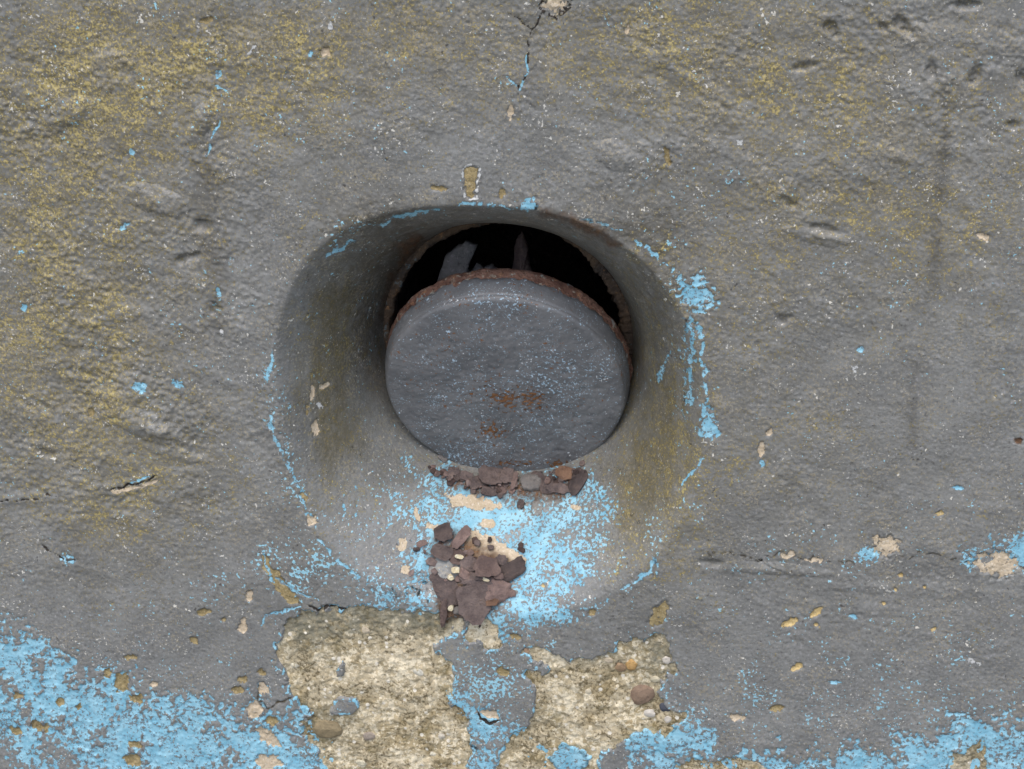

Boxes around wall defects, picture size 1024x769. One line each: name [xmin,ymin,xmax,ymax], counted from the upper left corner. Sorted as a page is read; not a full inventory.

crack [506,13,542,121]
spalling [460,164,481,201]
corrosion [387,268,633,383]
corrosion [469,380,556,443]
crack [110,475,158,494]
corrosion [441,459,570,499]
corrosion [425,532,501,591]
corrosion [437,598,464,628]
spalling [0,451,1024,769]